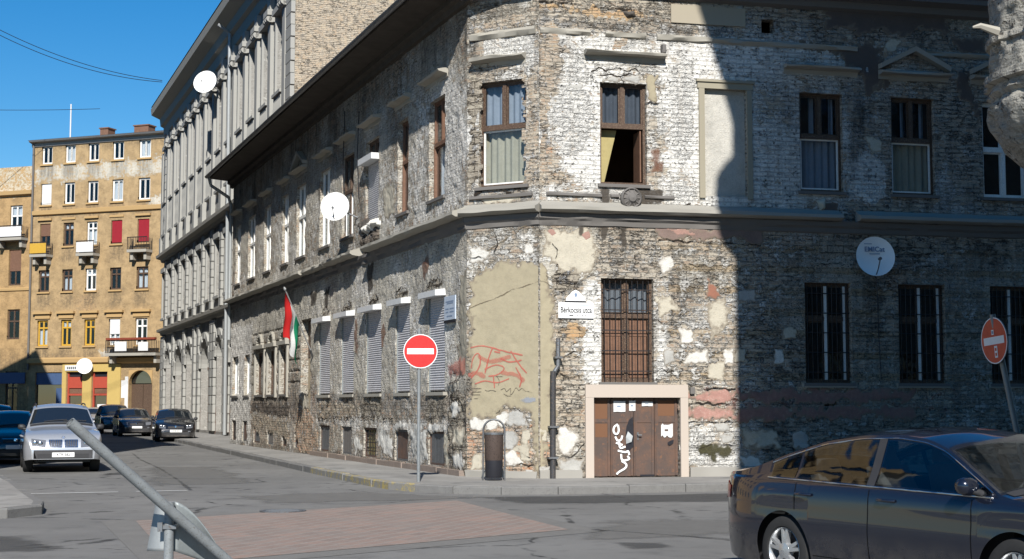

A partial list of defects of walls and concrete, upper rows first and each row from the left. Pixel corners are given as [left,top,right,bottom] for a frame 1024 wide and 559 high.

crack [591,67,659,104]
spalling [469,237,498,264]
spalling [524,227,600,296]
peeling [658,255,675,275]
crack [469,280,554,309]
peeling [655,295,680,318]
spalling [560,322,594,356]
spalling [663,278,810,467]
corrosion [595,400,607,437]
damp [698,443,732,462]